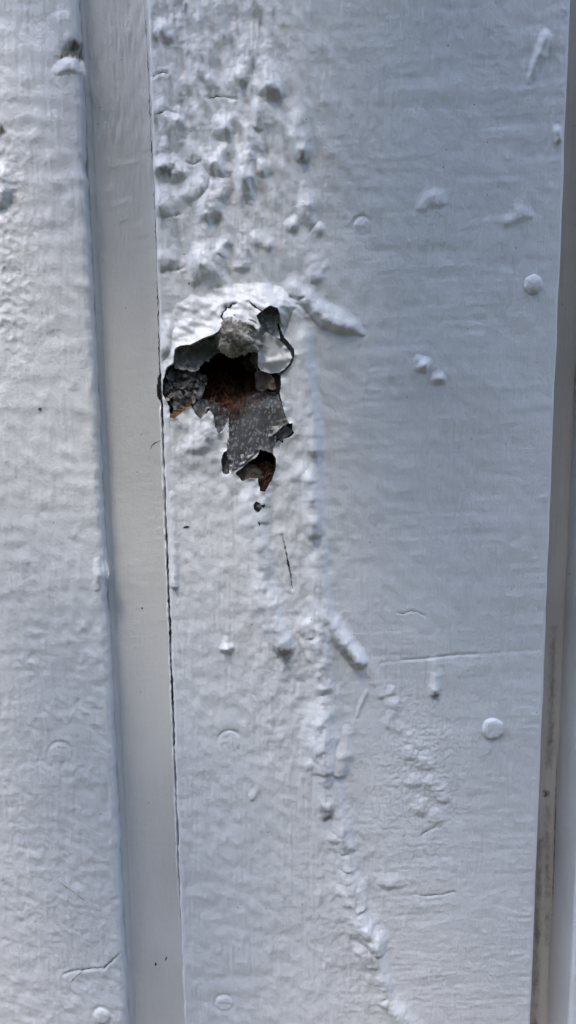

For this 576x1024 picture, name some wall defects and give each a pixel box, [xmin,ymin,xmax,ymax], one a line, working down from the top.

peeling [157,282,297,526]